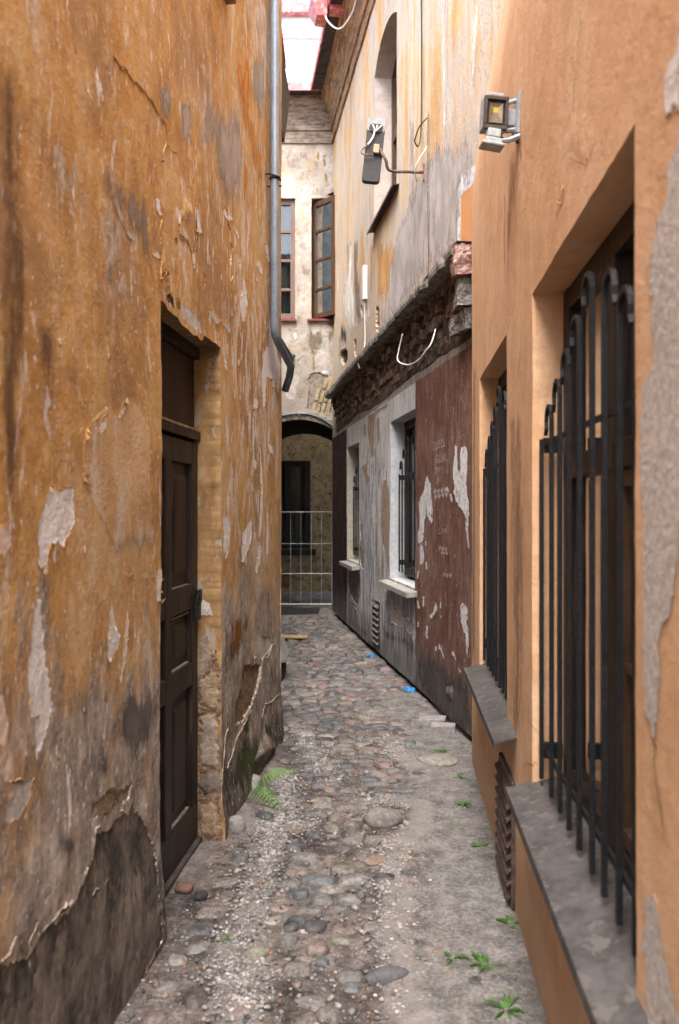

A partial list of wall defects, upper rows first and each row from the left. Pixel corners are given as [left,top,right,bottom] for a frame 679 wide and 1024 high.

crack [113,57,178,162]
peeling [195,207,204,235]
peeling [165,241,270,340]
peeling [222,442,273,578]
spalling [252,165,476,609]
flaking render [639,137,679,744]
peeling [0,397,165,836]
damp [123,690,152,751]
crack [221,644,279,806]
flaking render [0,775,166,1024]